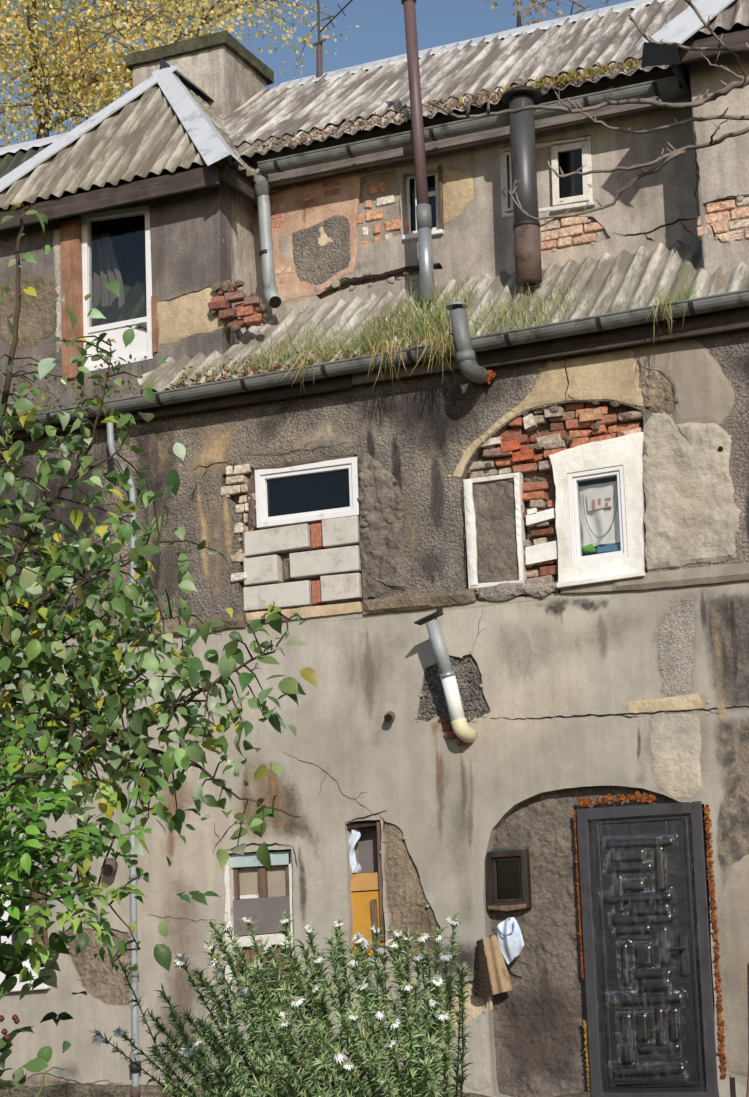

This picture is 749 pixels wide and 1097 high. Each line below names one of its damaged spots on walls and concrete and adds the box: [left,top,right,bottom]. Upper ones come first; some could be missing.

peeling [261,169,420,303]
flaking render [541,216,610,252]
flaking render [697,194,749,242]
peeling [157,280,270,346]
flaking render [448,348,679,592]
damp [701,597,749,718]
flaking render [415,655,490,752]
crack [493,705,749,720]
crack [284,752,387,829]
flaking render [380,822,441,964]
flaking render [64,926,131,1006]